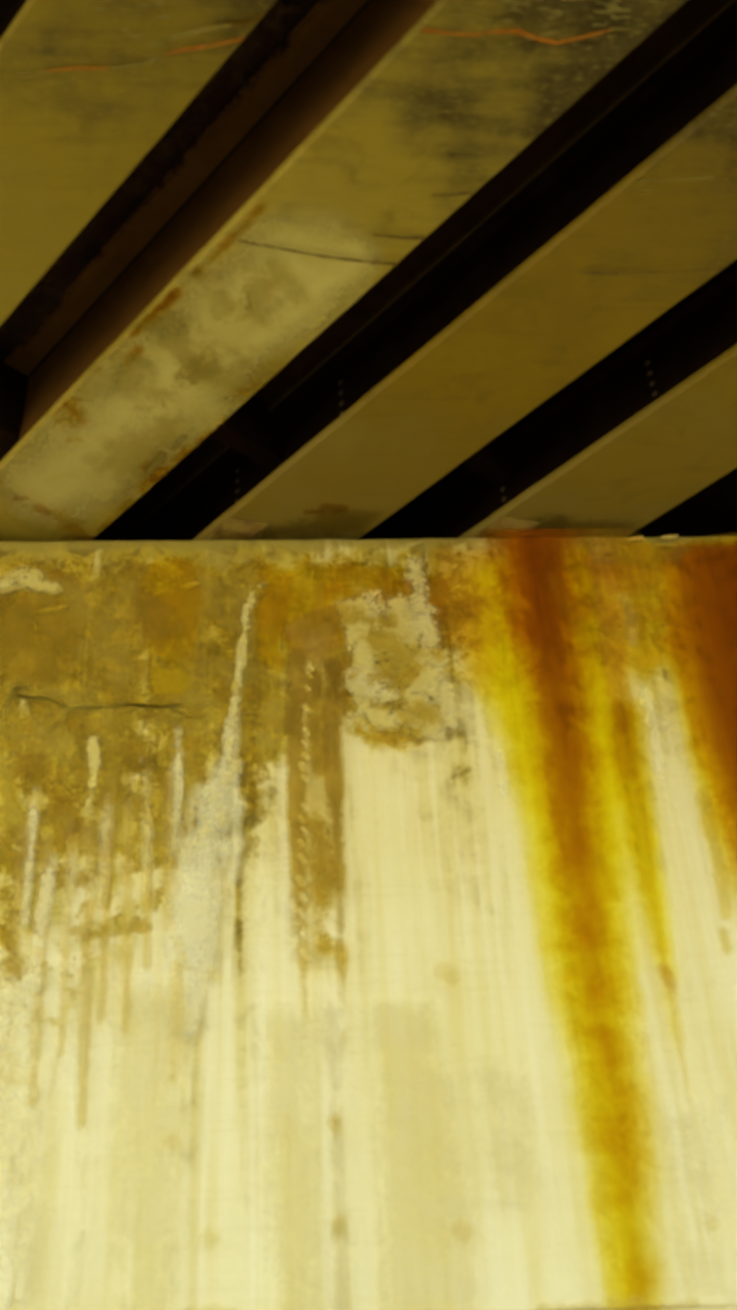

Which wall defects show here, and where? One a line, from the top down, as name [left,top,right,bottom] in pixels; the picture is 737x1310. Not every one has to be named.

corrosion [0,0,322,351]
damp [172,585,261,861]
damp [298,664,315,783]
peeling [337,541,459,740]
damp [24,859,52,960]